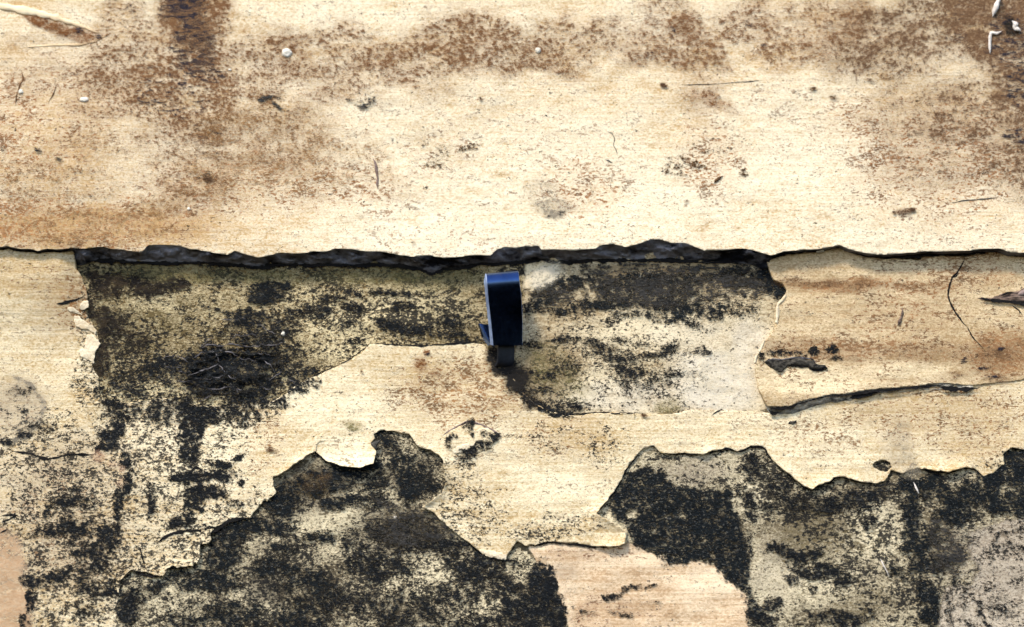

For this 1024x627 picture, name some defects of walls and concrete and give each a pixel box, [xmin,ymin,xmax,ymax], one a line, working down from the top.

leakage [0,0,1024,249]
leakage [0,375,57,447]
leakage [18,271,663,627]
crack [0,240,803,275]
spalling [67,253,787,417]
spalling [116,431,1024,627]
crack [837,247,986,348]